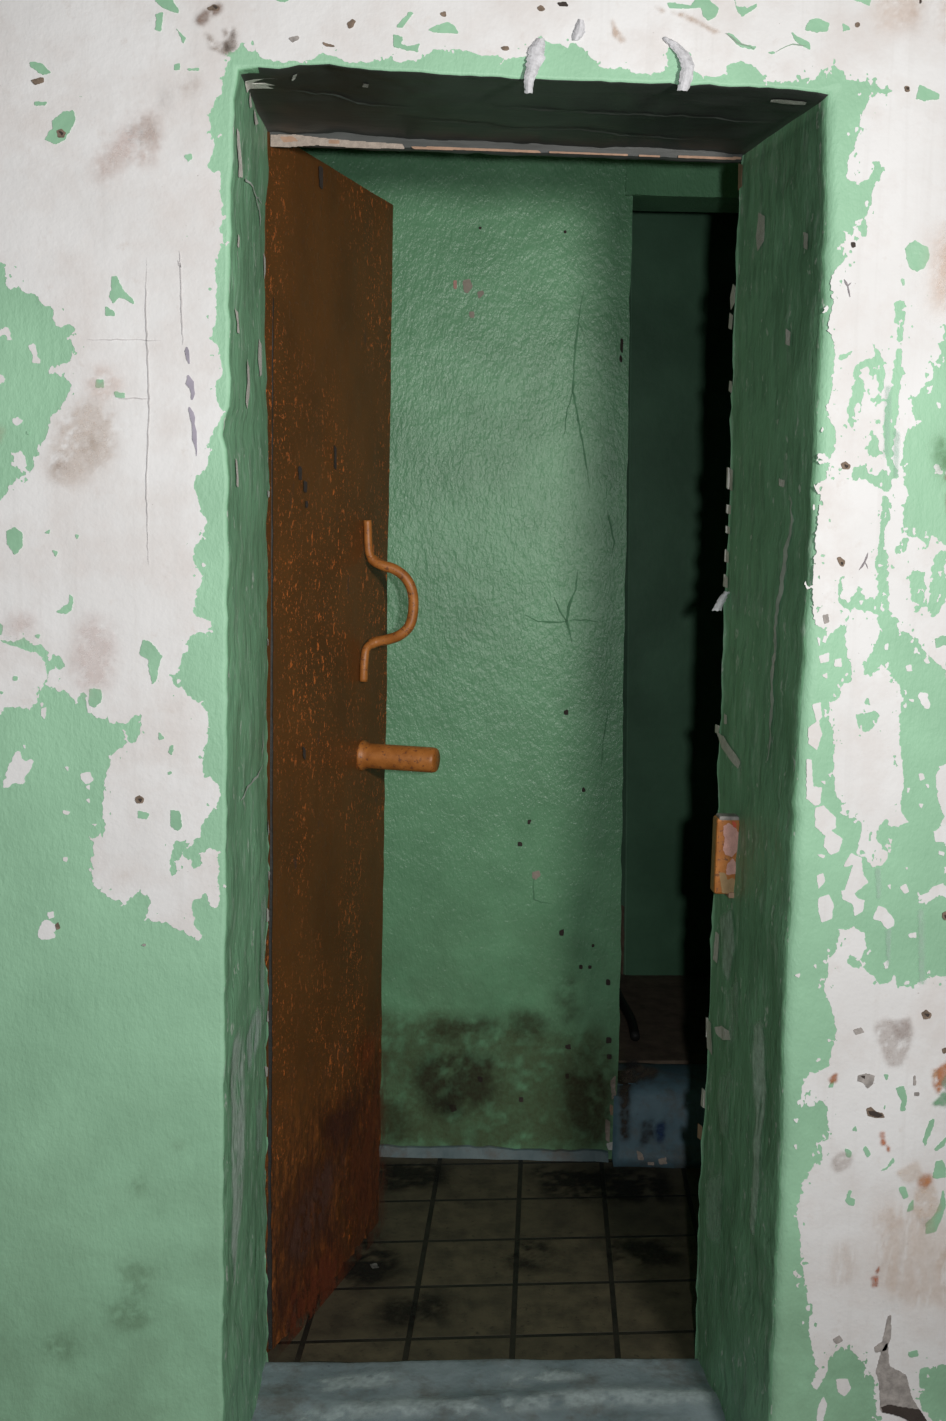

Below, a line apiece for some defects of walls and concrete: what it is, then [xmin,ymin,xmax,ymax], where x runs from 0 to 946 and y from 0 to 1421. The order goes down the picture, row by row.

peeling [0,0,946,941]
peeling [793,926,946,1421]
corrosion [934,1064,946,1105]